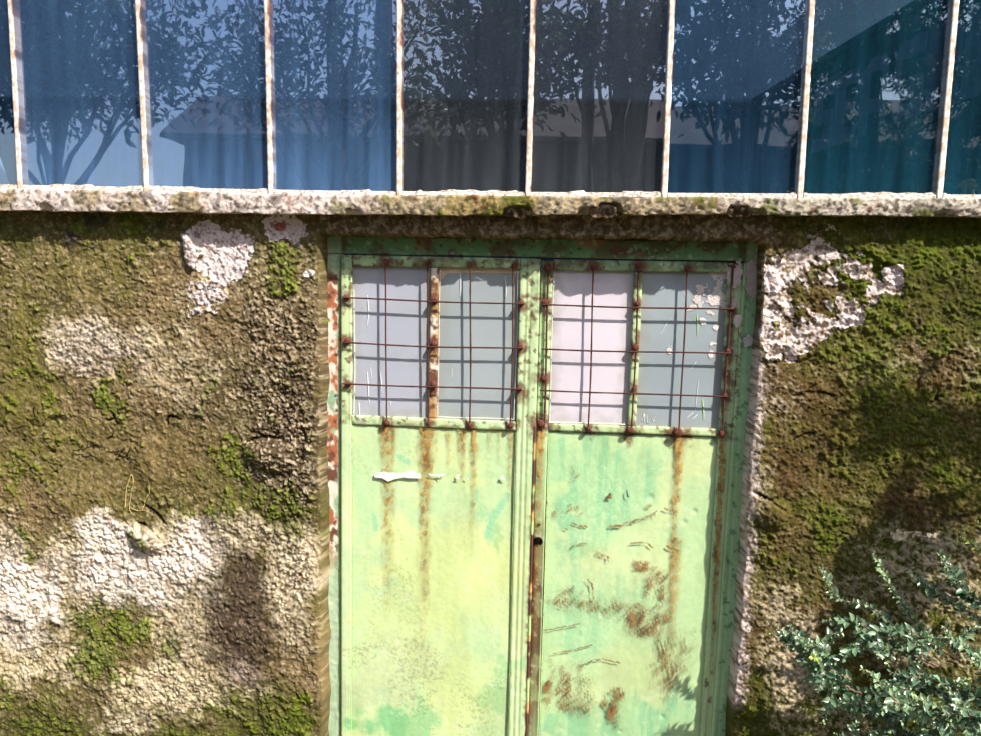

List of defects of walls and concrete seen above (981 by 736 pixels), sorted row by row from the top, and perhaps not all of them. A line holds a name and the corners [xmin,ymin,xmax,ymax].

spalling [180,214,309,317]
spalling [758,224,905,363]
leakage [0,513,311,682]
corrosion [381,427,394,542]
corrosion [420,428,435,566]
corrosion [447,430,477,485]
corrosion [537,431,545,488]
corrosion [549,437,687,692]
corrosion [713,440,725,610]
corrosion [543,667,625,729]